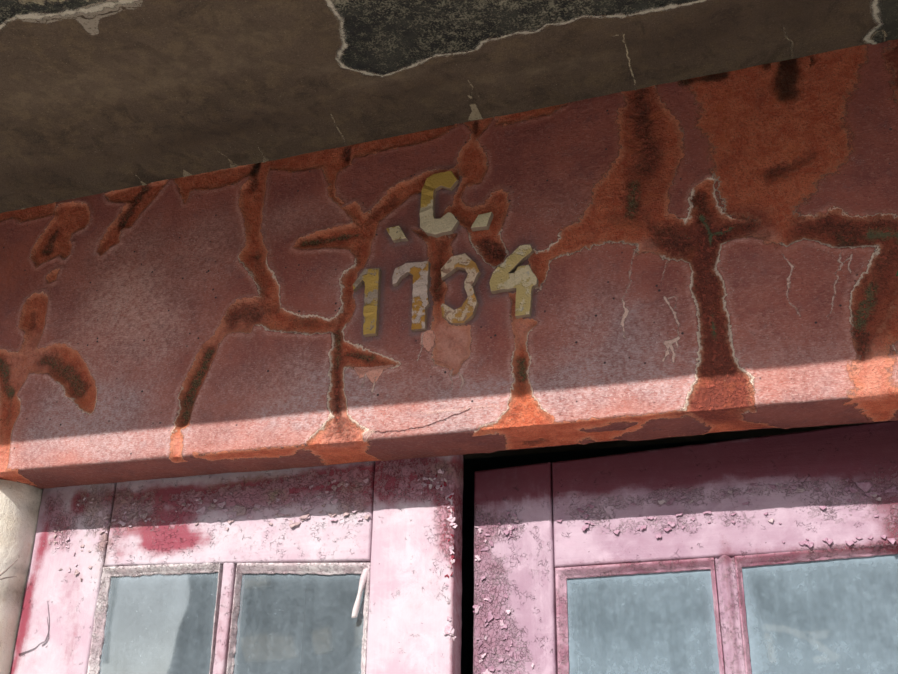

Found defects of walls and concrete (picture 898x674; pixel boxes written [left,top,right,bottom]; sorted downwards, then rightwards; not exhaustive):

crack [169,33,898,458]
peeling [175,479,370,530]
peeling [845,535,896,546]